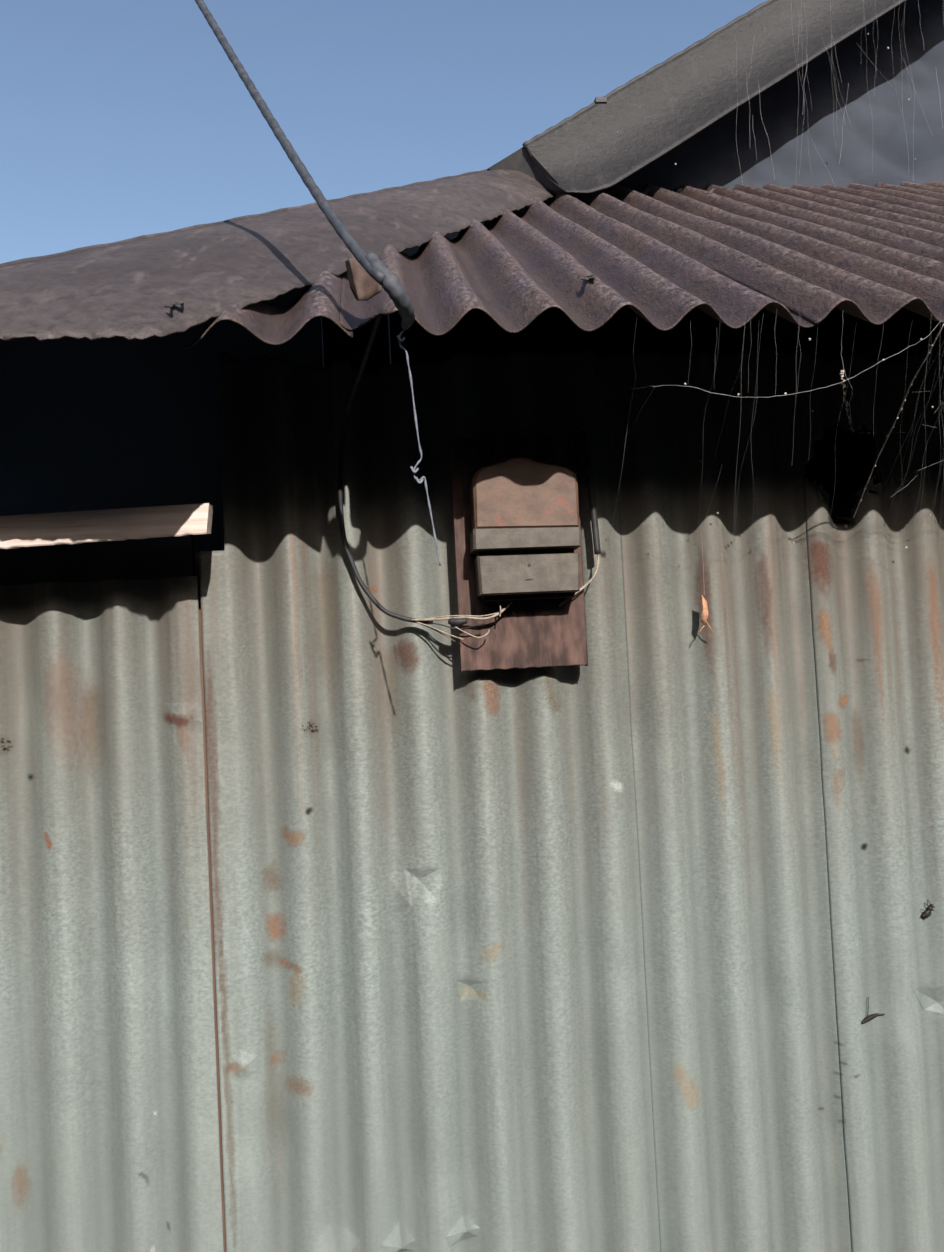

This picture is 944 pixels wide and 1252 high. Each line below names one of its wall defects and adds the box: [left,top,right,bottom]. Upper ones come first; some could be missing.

spalling [805,427,881,520]
rust [166,715,187,725]